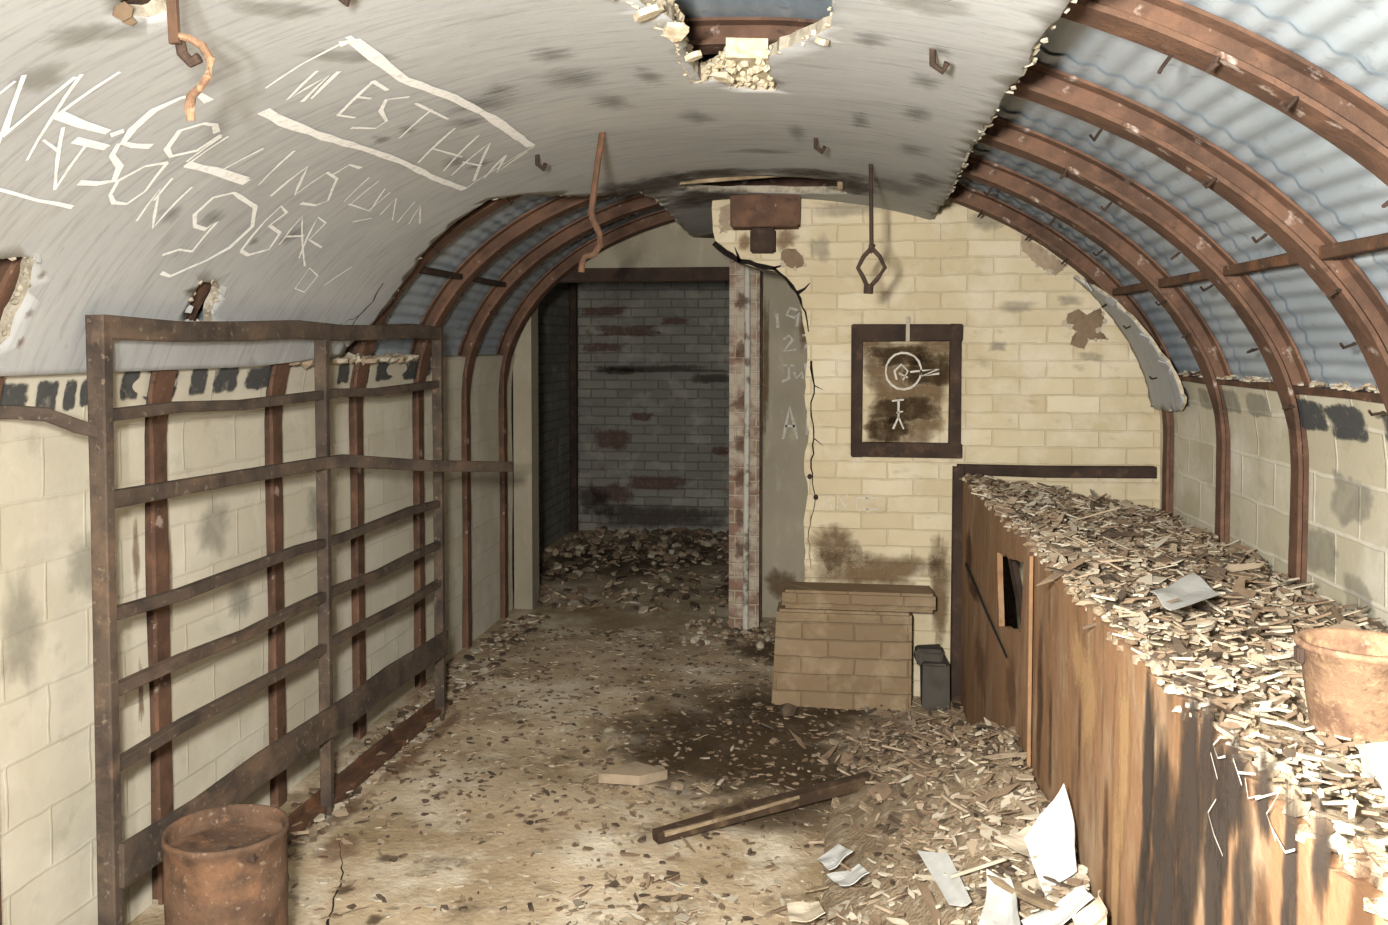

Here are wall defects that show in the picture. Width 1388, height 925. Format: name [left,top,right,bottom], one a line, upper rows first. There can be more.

spalling [112,0,151,26]
spalling [612,0,833,89]
spalling [4,253,41,305]
peeling [1017,231,1187,411]
crack [712,241,823,565]
water stain [816,529,948,632]